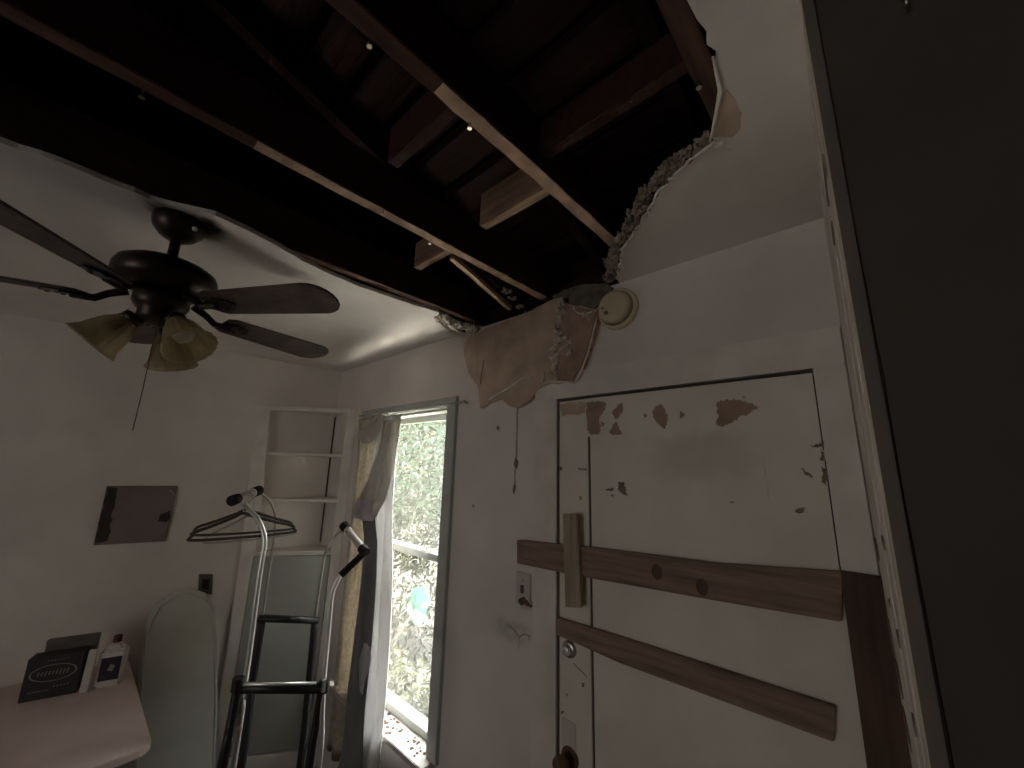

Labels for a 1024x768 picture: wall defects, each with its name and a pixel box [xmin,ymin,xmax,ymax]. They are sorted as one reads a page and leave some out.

spalling [602,130,732,283]
spalling [434,311,484,337]
peeling [560,400,625,436]
peeling [643,403,686,429]
peeling [714,396,759,428]
peeling [801,441,829,485]
peeling [606,481,628,497]